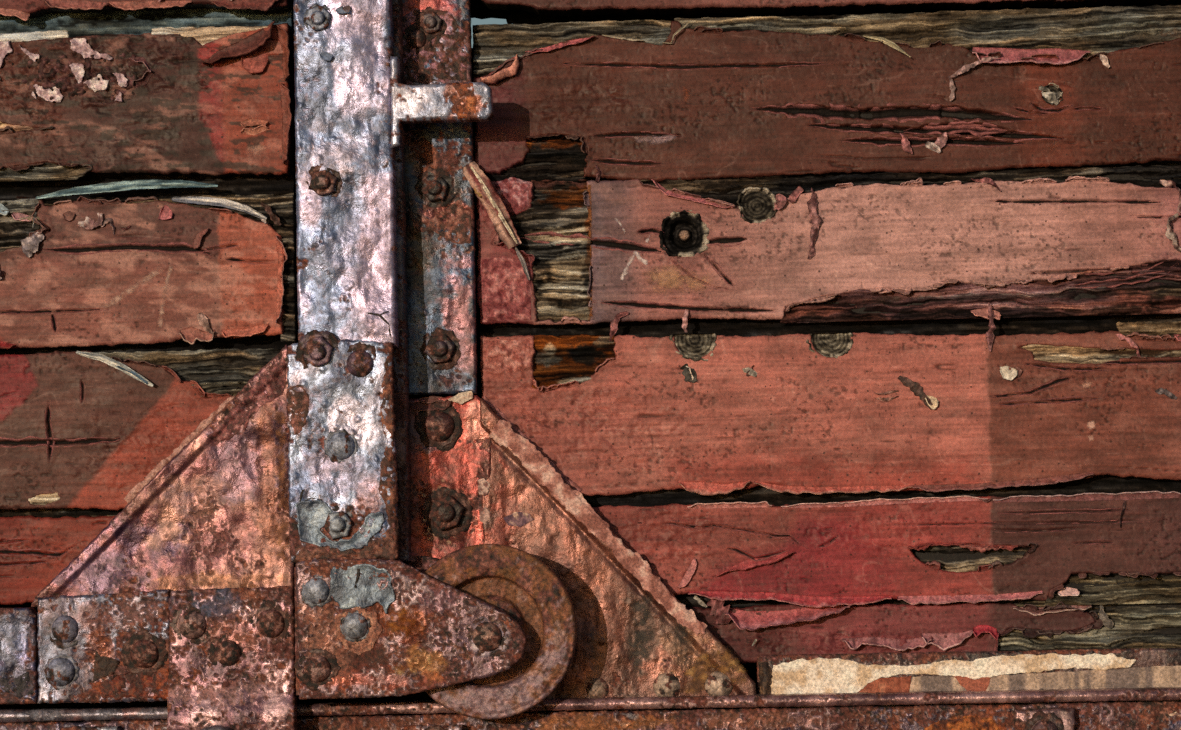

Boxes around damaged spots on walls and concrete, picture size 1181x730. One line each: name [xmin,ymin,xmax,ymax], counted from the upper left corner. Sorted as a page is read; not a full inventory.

peeling [0,8,153,103]
rust [402,8,478,120]
peeling [473,5,1181,101]
crack [750,101,1105,148]
peeling [0,163,296,398]
crack [518,227,773,313]
peeling [640,164,1181,364]
rust [207,353,399,561]
peeling [489,420,1181,694]
rust [90,660,169,700]
rust [335,607,422,655]
rust [684,651,773,694]